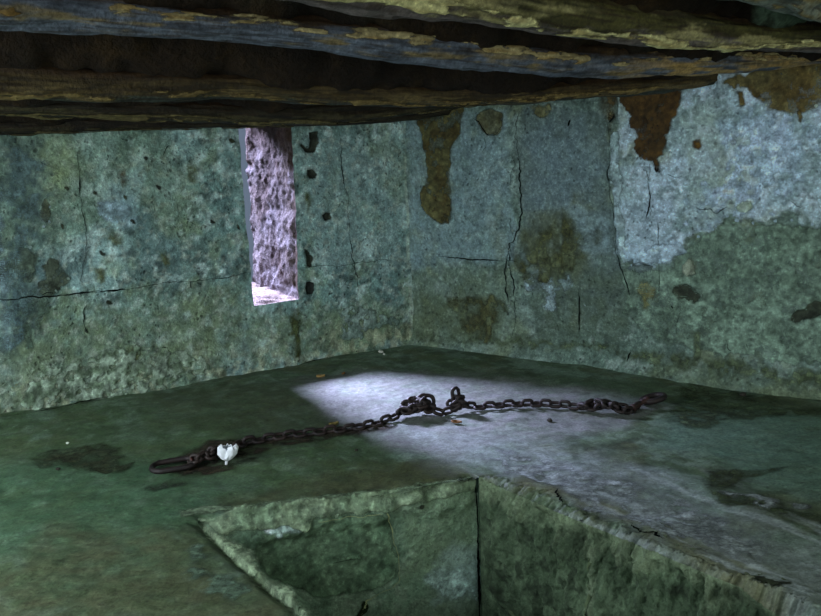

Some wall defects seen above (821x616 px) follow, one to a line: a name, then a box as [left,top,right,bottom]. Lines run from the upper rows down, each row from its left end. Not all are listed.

crack [0,154,246,333]
rust [416,107,464,224]
crack [442,112,525,334]
damp [514,218,583,283]
rust [619,90,681,173]
peeling [609,132,821,366]
damp [35,444,134,474]